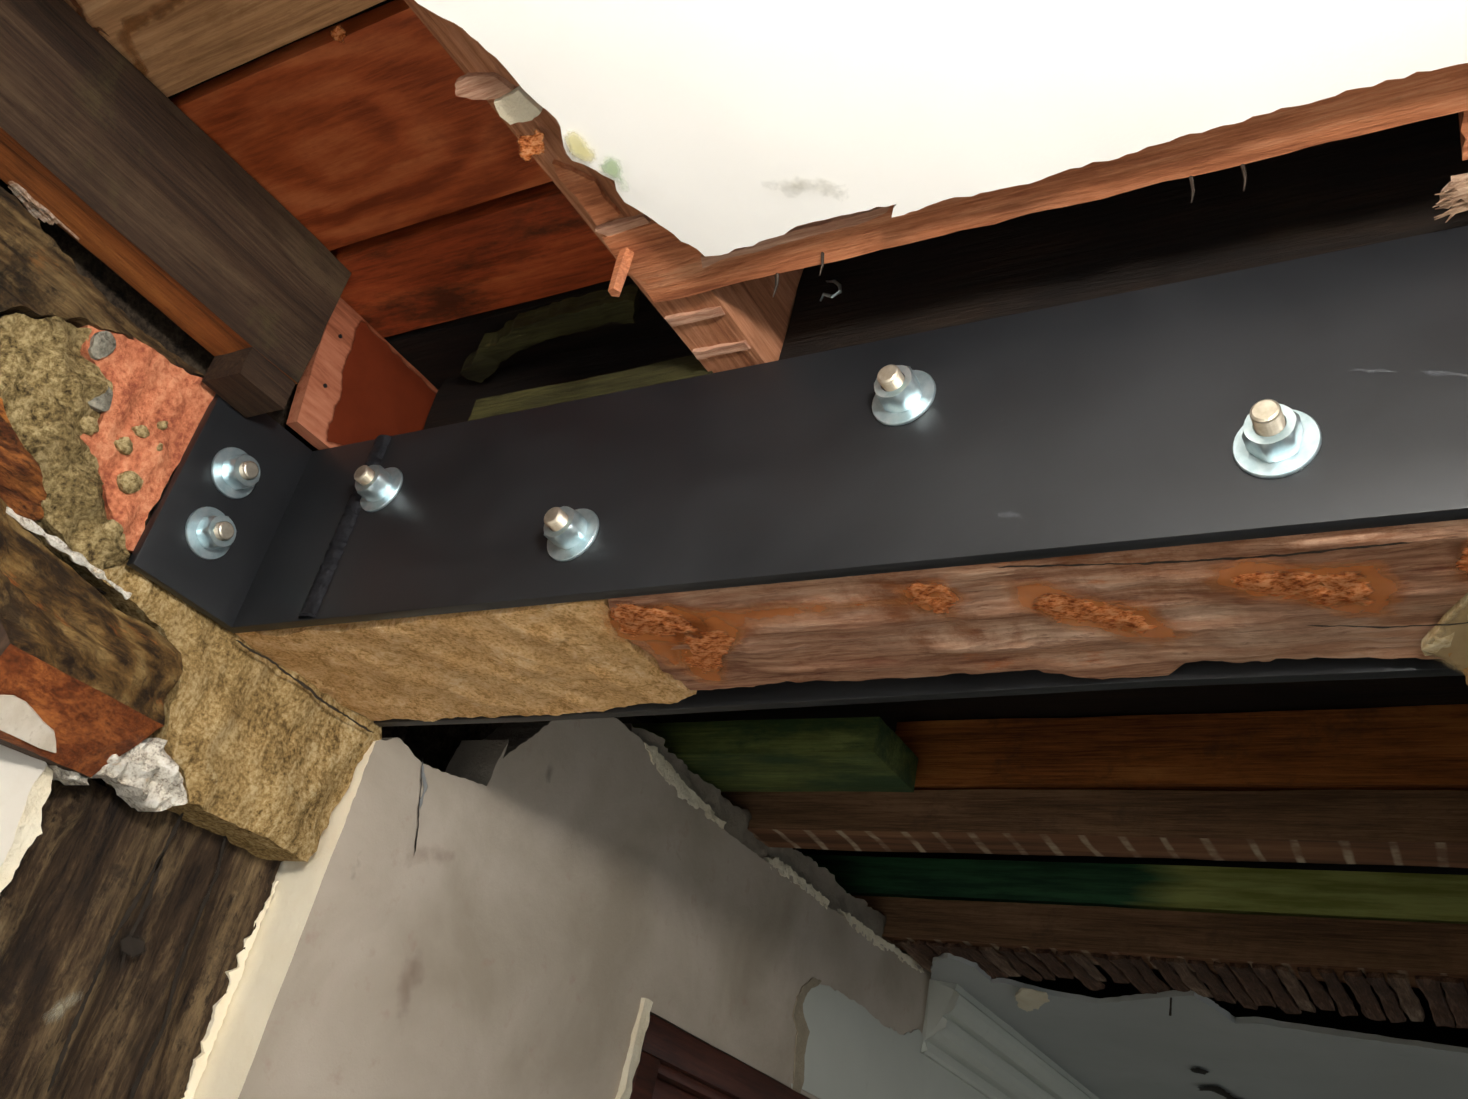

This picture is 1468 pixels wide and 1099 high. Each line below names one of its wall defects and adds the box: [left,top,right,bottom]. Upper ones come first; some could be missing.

flaking render [78,325,216,553]
peeling [905,582,956,614]
peeling [1230,571,1376,608]
peeling [611,603,735,673]
crack [414,760,427,854]
flaking render [623,723,924,973]
flaking render [1015,987,1050,1012]